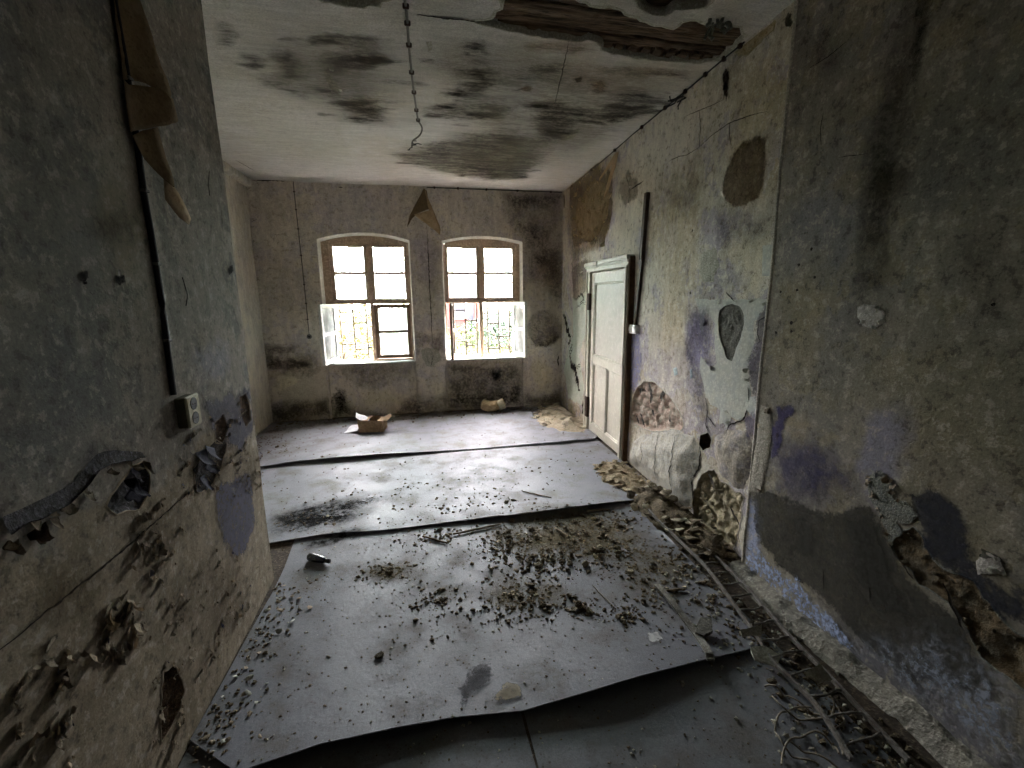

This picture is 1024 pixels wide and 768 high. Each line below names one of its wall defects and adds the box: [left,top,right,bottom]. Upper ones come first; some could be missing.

leakage [273,35,394,119]
leakage [429,69,499,119]
leakage [400,94,661,179]
leakage [723,136,766,207]
flaking render [178,393,264,499]
leakage [404,363,558,409]
crack [557,293,586,415]
spalling [630,381,684,432]
peeling [691,298,773,551]
peeling [2,450,258,768]
leakage [746,491,1012,756]
flaking render [865,470,1024,691]